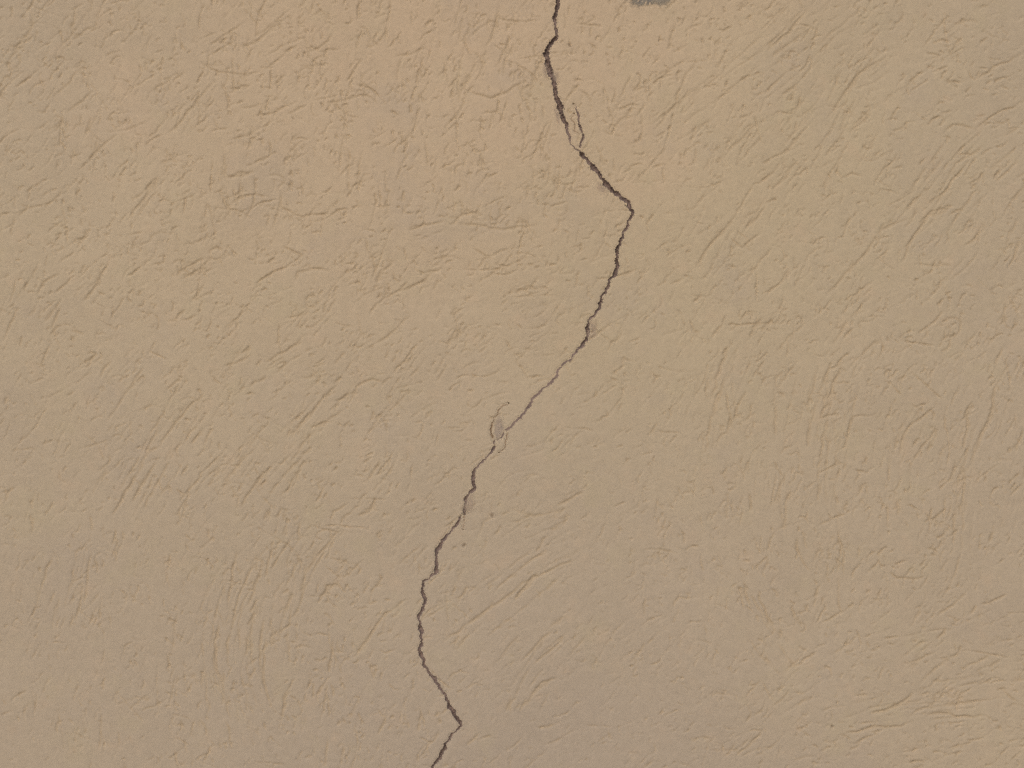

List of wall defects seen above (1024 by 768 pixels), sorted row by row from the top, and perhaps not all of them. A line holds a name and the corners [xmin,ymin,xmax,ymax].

crack [416,0,636,768]